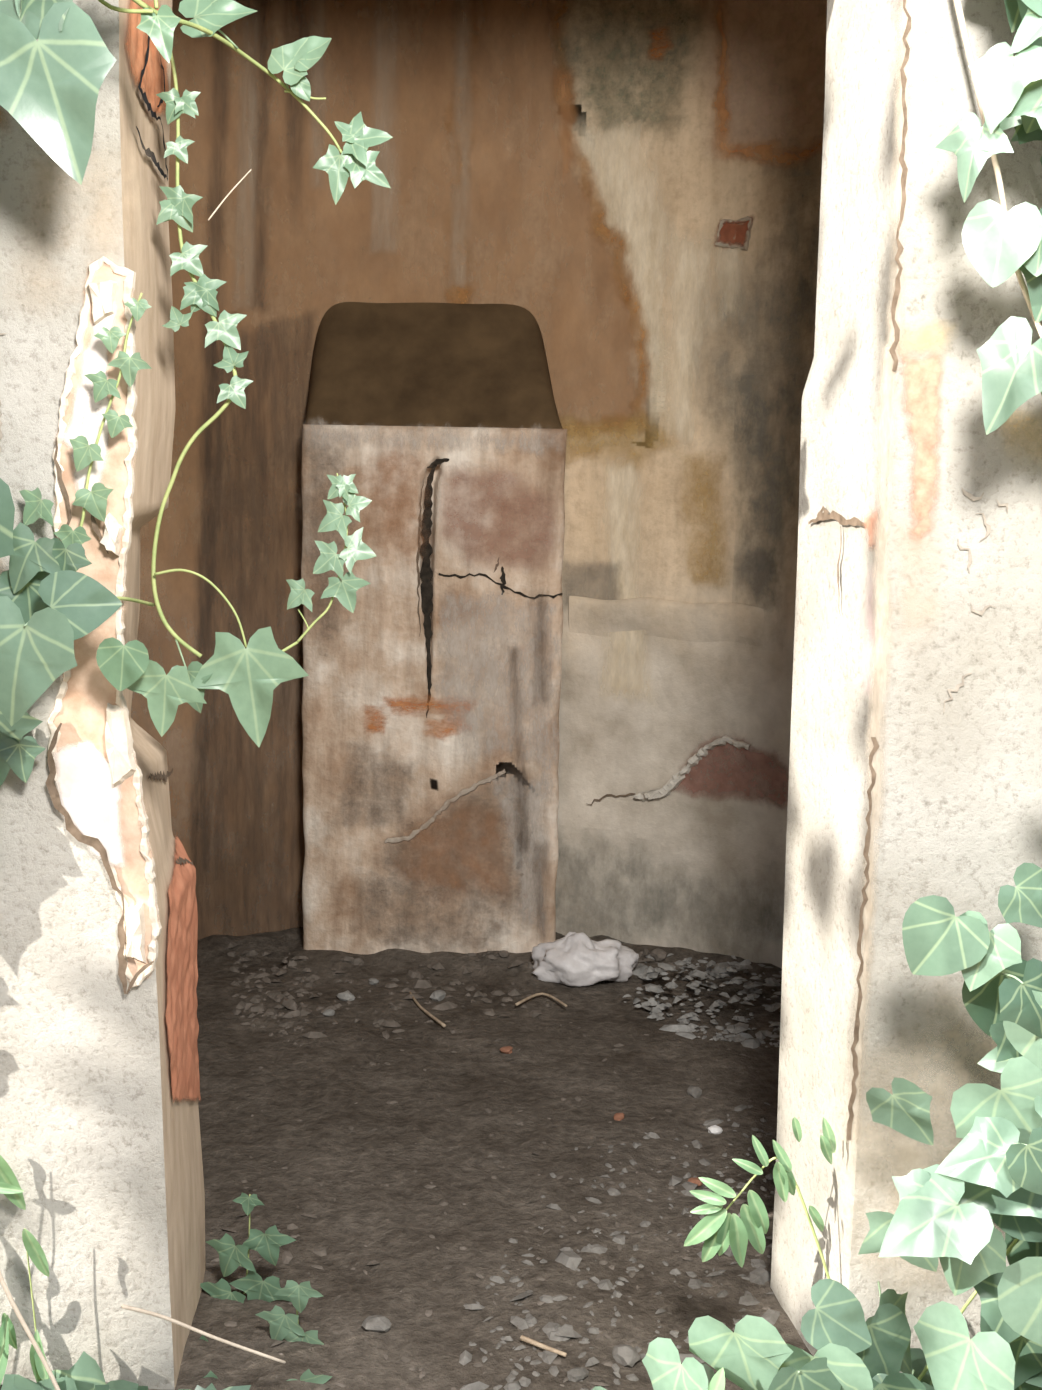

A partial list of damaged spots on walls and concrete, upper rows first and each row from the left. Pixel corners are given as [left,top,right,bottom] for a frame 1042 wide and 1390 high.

spalling [126,0,169,113]
spalling [889,0,942,536]
spalling [48,256,201,1101]
crack [416,458,563,718]
spalling [588,735,789,806]